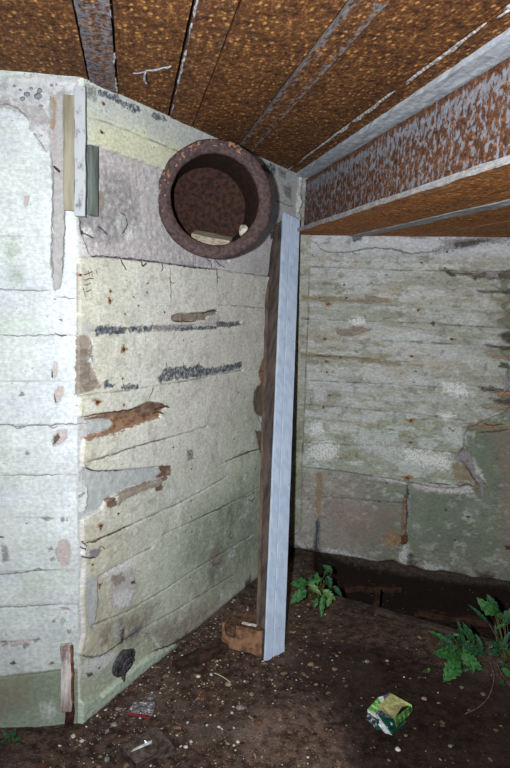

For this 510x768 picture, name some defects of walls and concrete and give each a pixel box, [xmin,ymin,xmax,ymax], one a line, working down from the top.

crack [312,241,444,255]
spalling [171,309,221,327]
spalling [75,323,101,394]
peeling [441,381,473,399]
spalling [83,401,170,441]
peeling [303,411,485,497]
spalling [76,465,177,516]